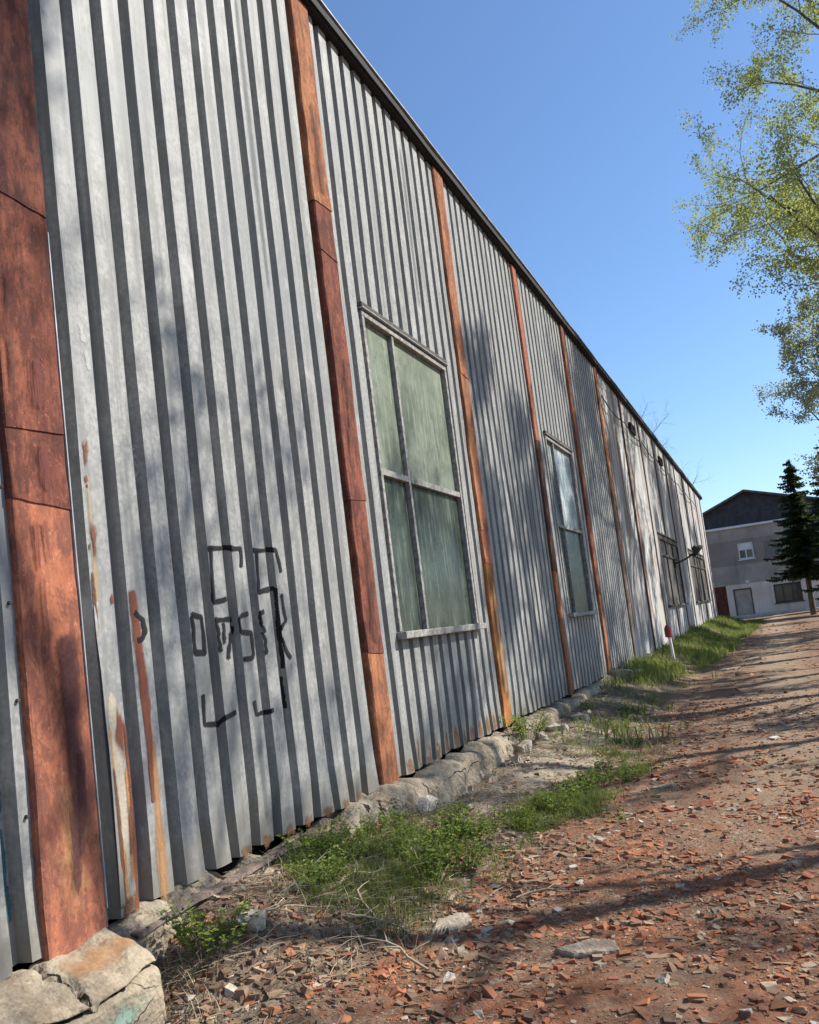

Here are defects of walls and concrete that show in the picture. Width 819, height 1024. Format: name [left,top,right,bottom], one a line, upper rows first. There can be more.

corrosion [83,442,114,627]
corrosion [129,590,168,898]